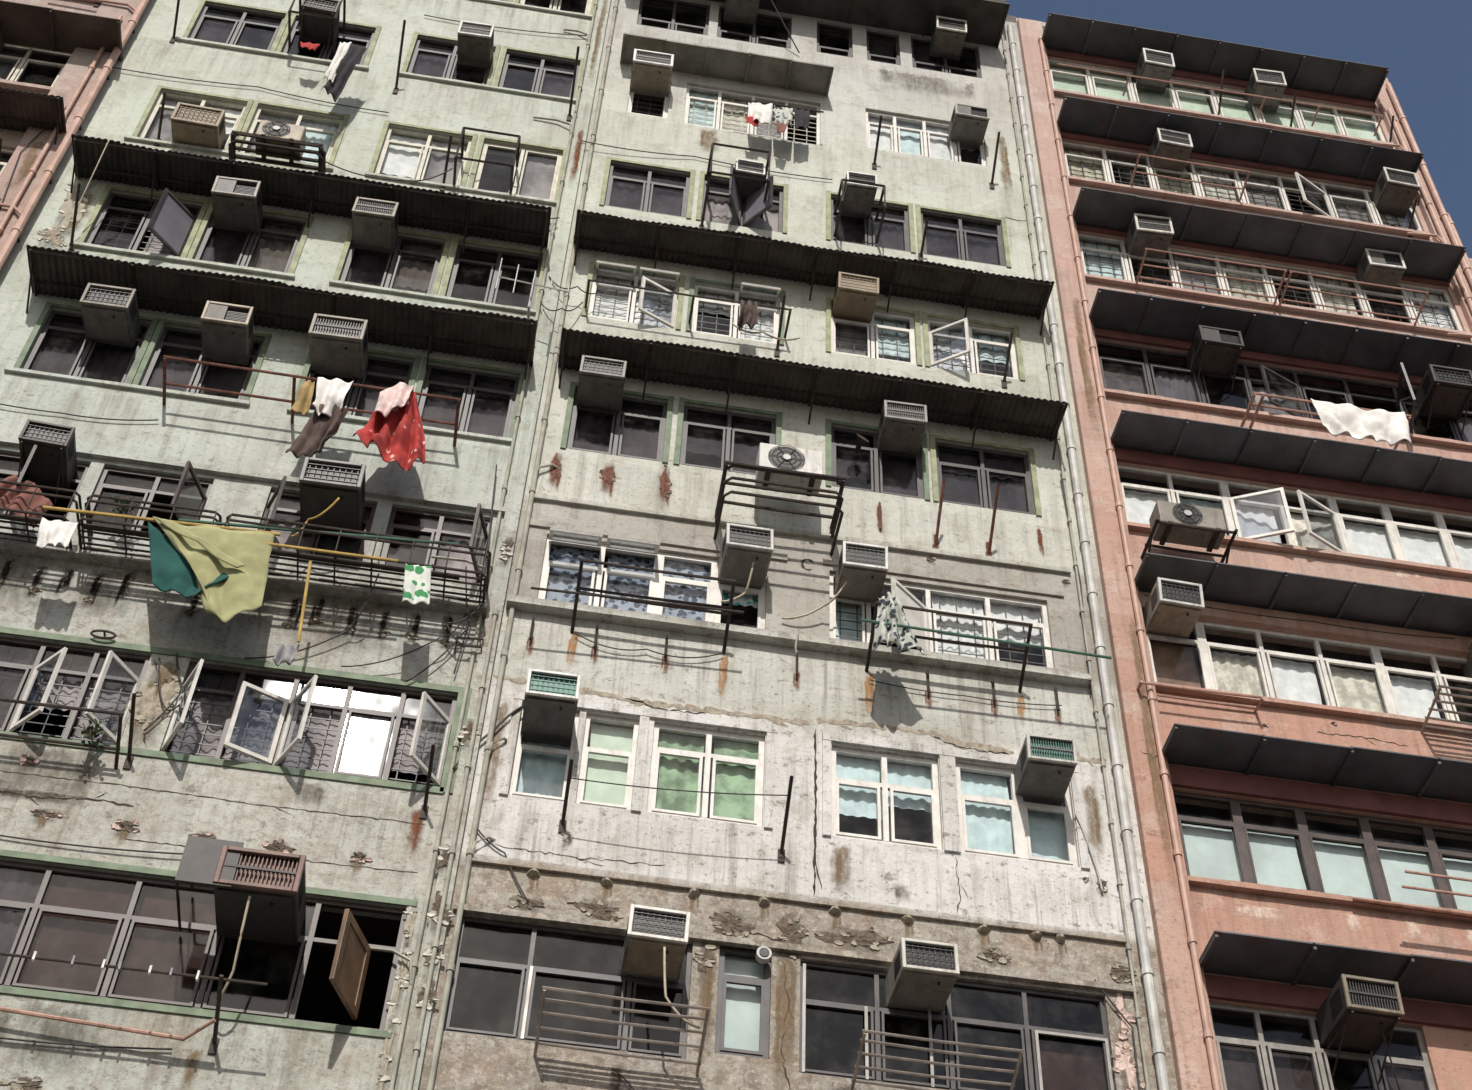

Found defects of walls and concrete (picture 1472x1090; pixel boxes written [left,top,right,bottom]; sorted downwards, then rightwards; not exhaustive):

rust [550,453,562,486]
rust [599,465,616,494]
rust [660,464,672,502]
spalling [693,912,756,974]
spalling [776,916,894,960]
peeling [1110,962,1152,1090]